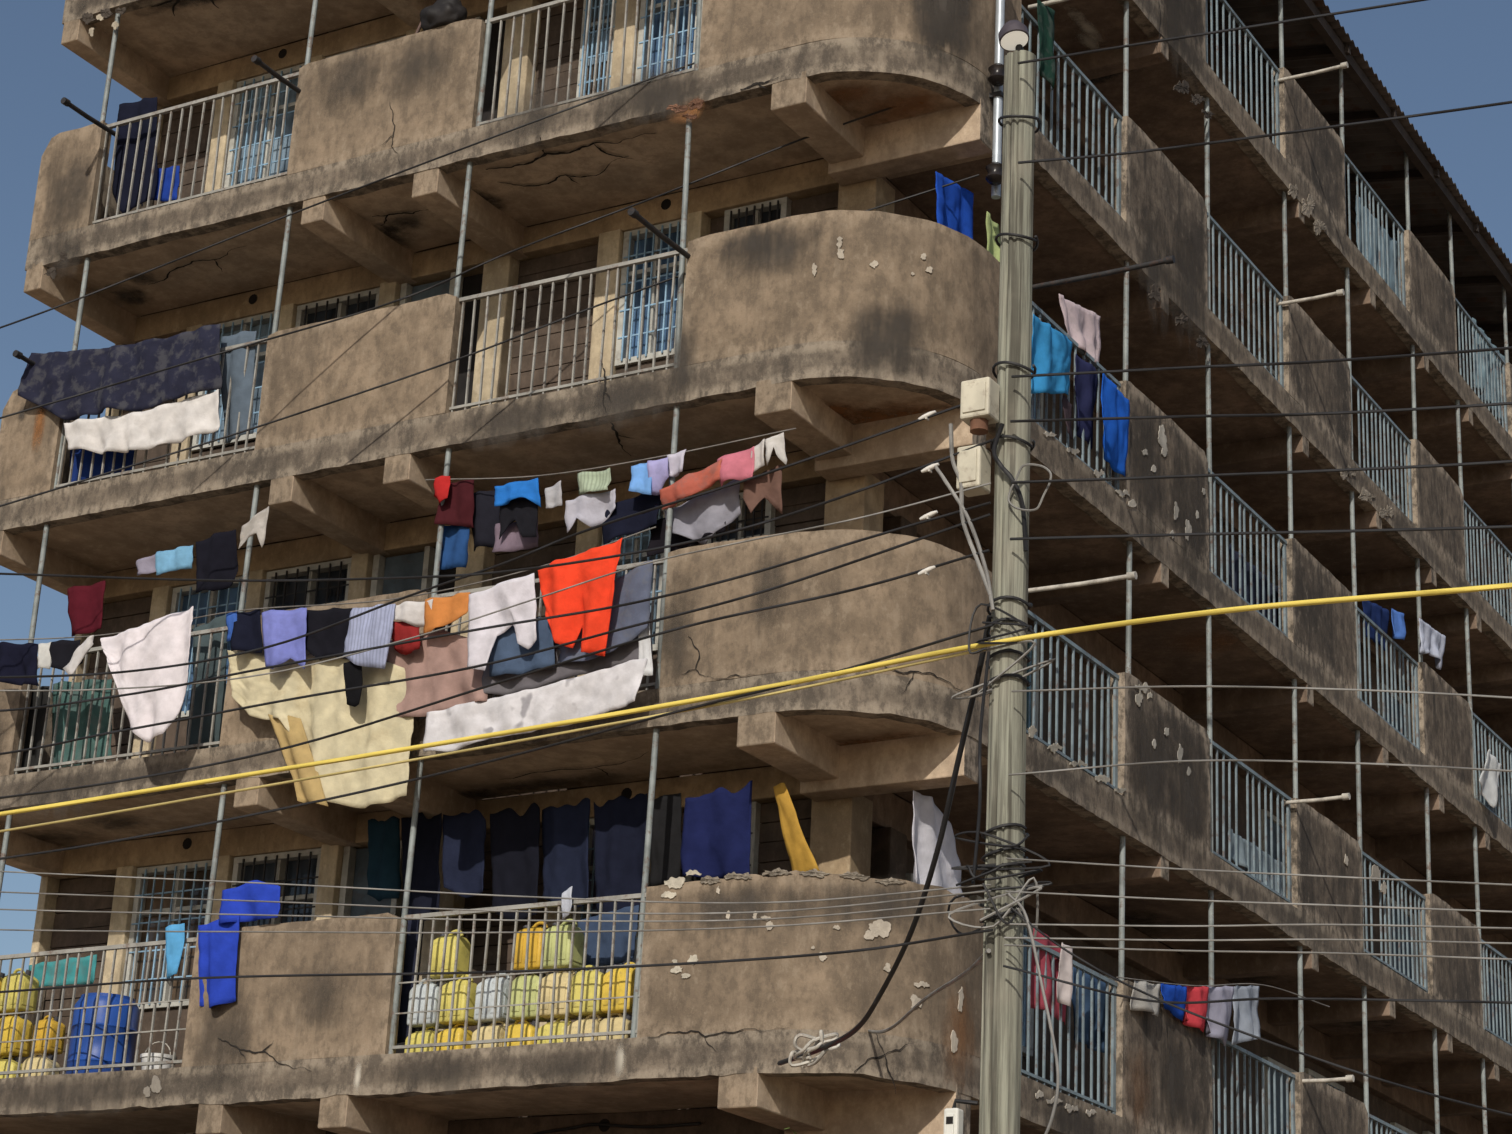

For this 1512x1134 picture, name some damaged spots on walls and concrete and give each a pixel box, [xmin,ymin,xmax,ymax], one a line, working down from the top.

crack [486,133,655,187]
crack [148,246,244,285]
water stain [855,312,912,365]
peeling [1141,425,1168,472]
peeling [1170,488,1206,541]
spalling [661,868,905,899]
peeling [864,919,891,940]
peeling [670,955,698,979]
peeling [910,981,930,1008]
crack [217,1038,310,1071]
crack [854,1035,907,1094]
peeling [950,1030,958,1053]